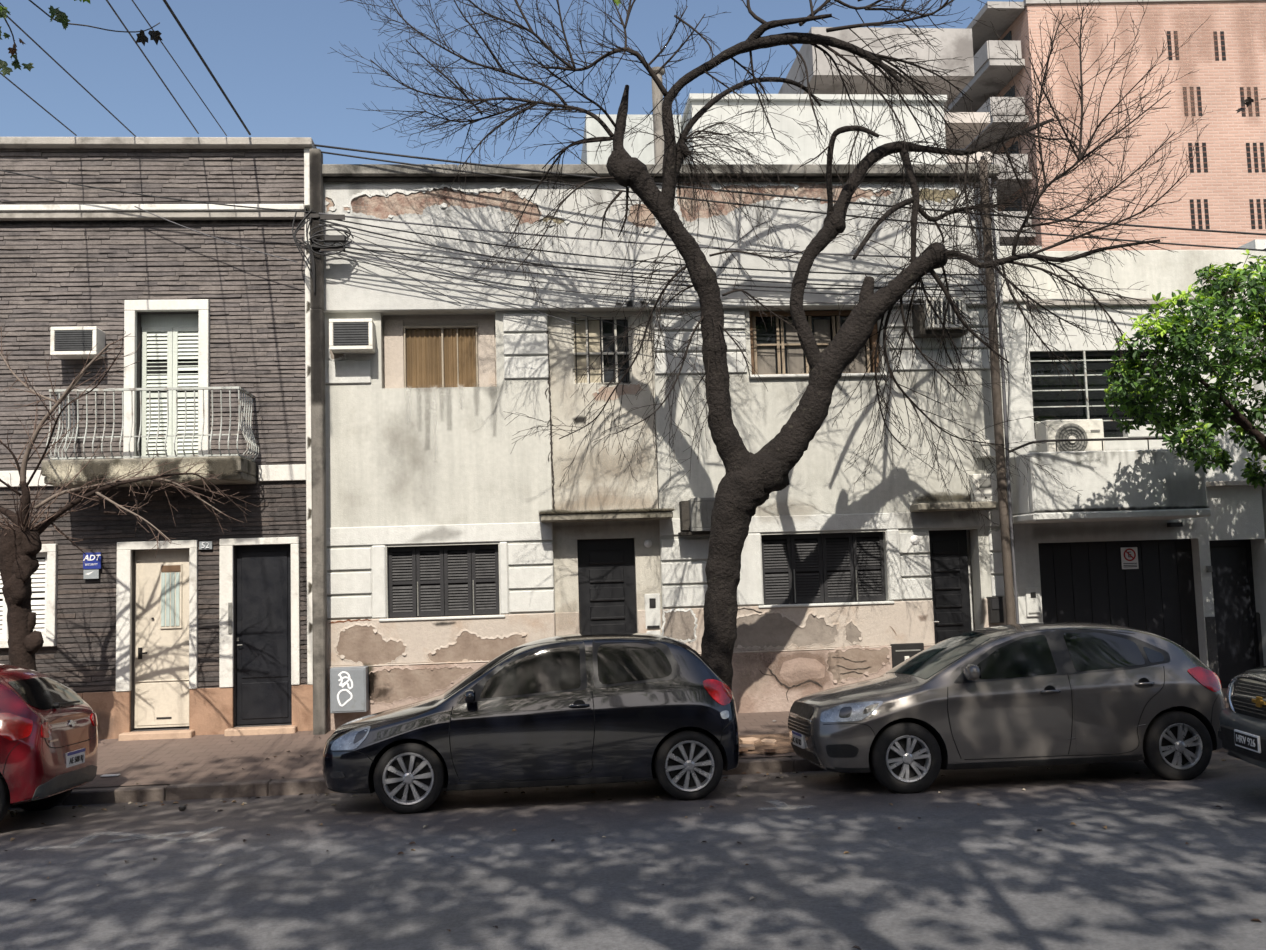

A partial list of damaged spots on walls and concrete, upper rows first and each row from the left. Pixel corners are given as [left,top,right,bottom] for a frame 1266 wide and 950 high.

peeling [323,182,571,229]
peeling [622,201,659,233]
peeling [674,182,964,225]
spalling [333,623,528,707]
peeling [661,608,698,643]
peeling [733,611,892,685]